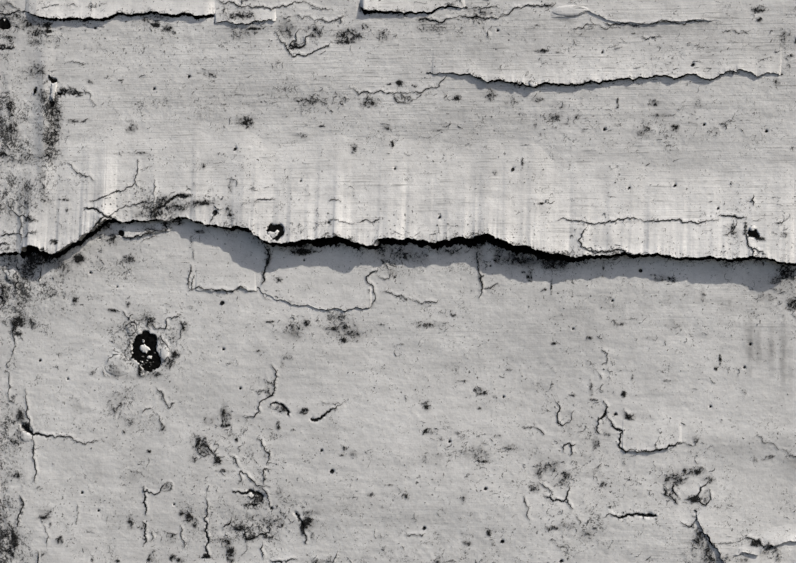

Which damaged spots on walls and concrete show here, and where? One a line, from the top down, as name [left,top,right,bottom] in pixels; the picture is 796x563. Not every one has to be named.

peeling [25,0,276,29]
peeling [360,0,466,13]
peeling [550,0,721,24]
peeling [430,36,782,87]
peeling [0,125,796,263]
crack [0,89,796,527]
crack [119,366,473,563]
peeling [696,473,796,563]